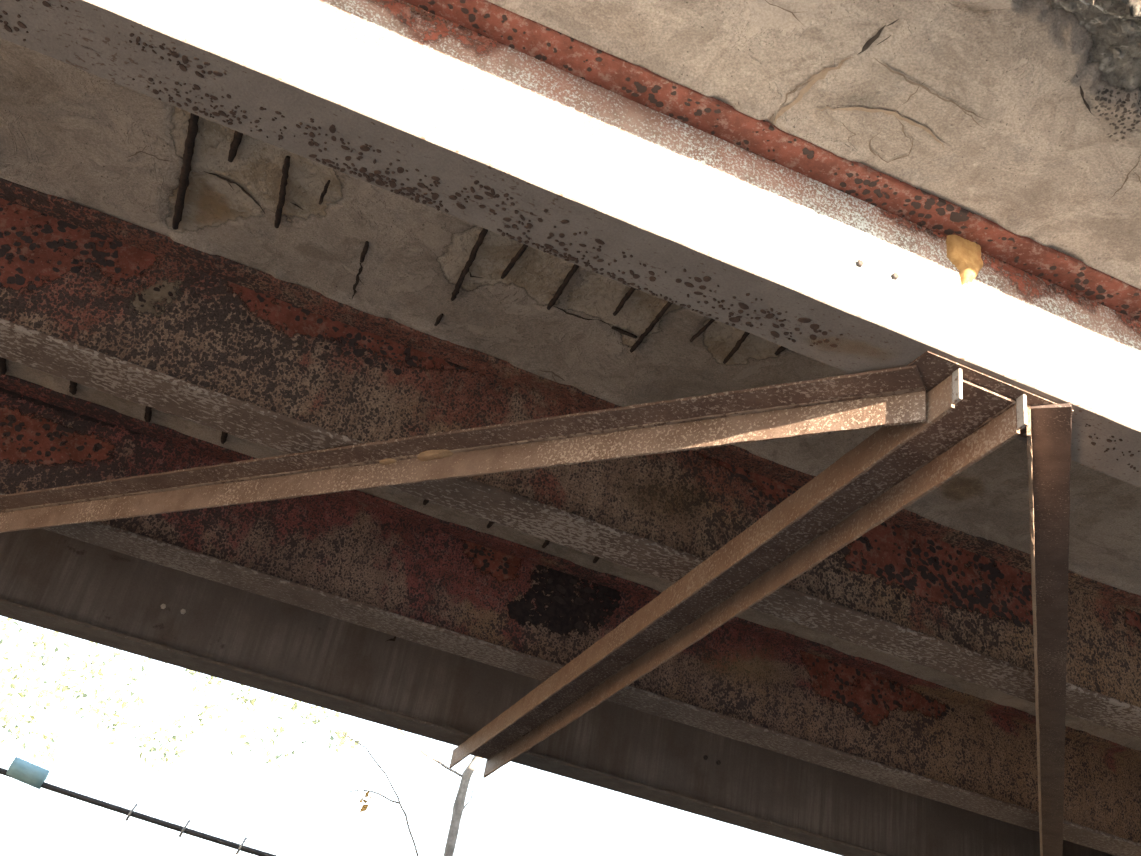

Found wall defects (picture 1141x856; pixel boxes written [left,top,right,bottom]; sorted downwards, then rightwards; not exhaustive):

spalling [1051,0,1141,91]
mould [1091,88,1141,141]
spalling [165,106,342,232]
corrosion [129,33,843,348]
spalling [437,226,682,353]
spalling [690,319,786,365]
corrosion [1085,424,1140,472]